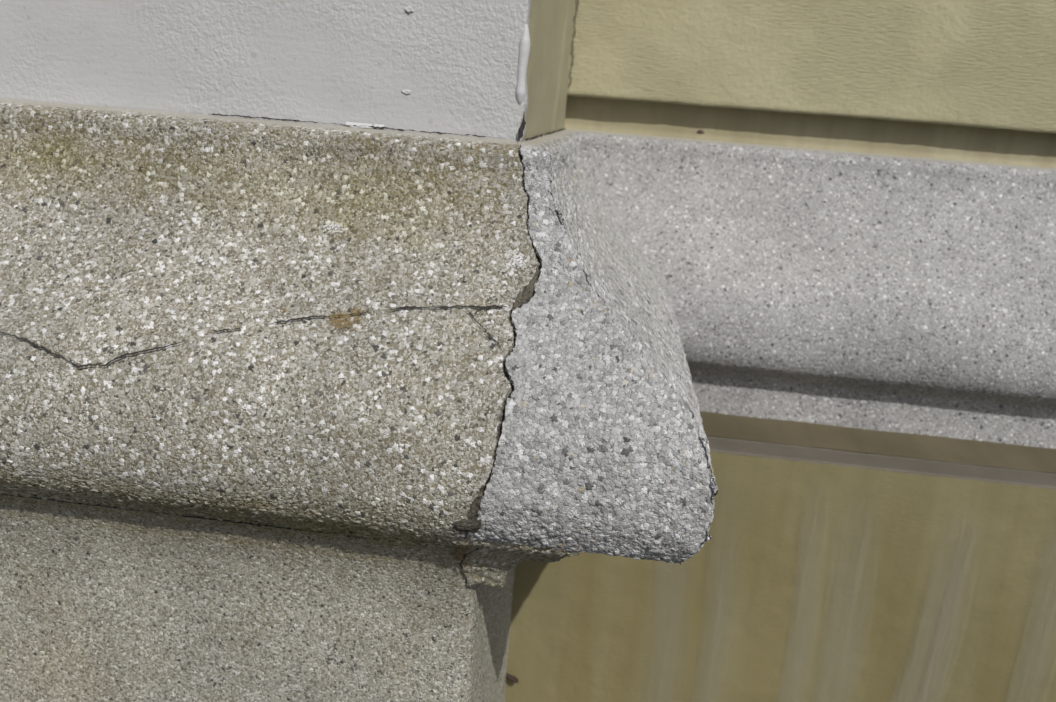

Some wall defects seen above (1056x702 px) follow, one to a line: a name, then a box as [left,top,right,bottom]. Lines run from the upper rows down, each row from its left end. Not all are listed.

crack [0,305,516,490]
spalling [451,489,580,587]